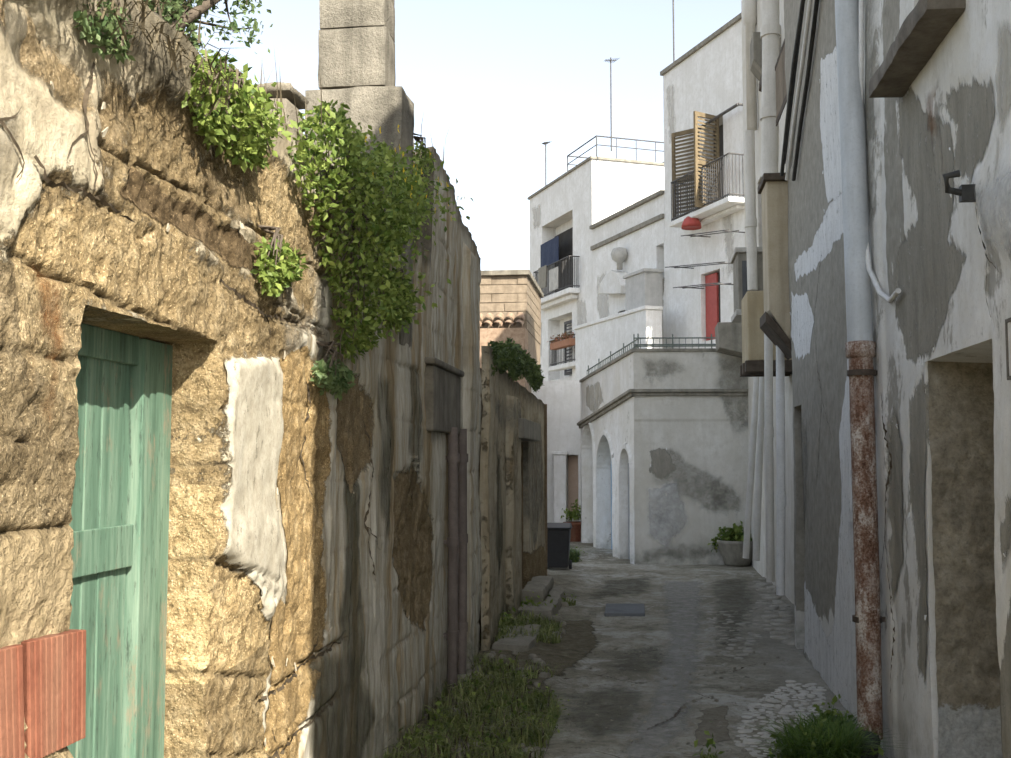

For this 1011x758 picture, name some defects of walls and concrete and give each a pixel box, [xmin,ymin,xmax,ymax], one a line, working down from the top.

crack [0,61,134,222]
peeling [20,11,126,154]
peeling [120,162,263,271]
peeling [887,78,995,685]
peeling [392,466,435,631]
peeling [1000,497,1011,571]
peeling [999,597,1011,758]